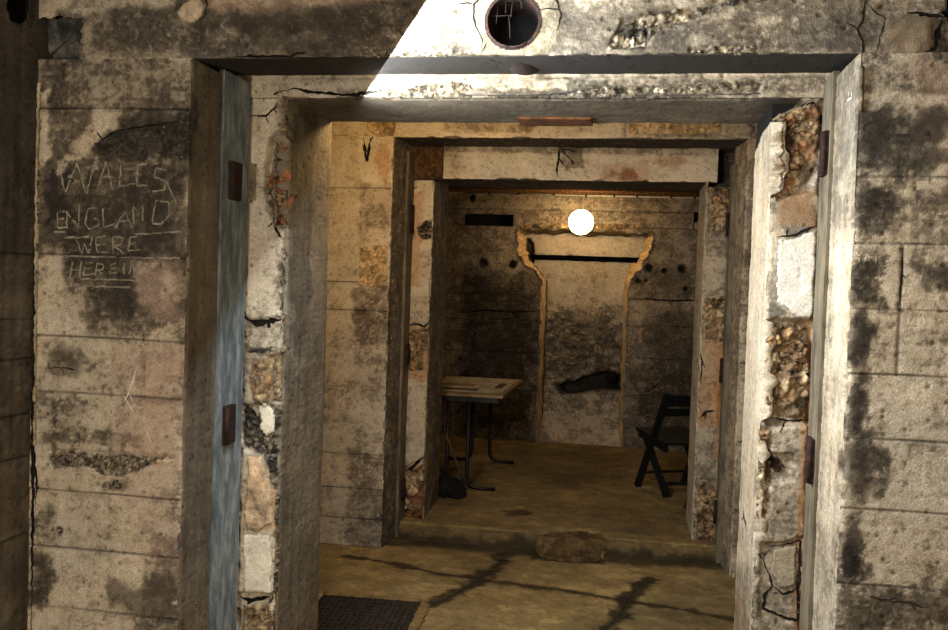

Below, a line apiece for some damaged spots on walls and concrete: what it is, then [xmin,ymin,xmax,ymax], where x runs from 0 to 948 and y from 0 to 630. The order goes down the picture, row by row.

crack [459,0,486,53]
crack [540,0,562,30]
spalling [606,0,749,50]
crack [846,0,945,53]
crack [252,88,394,124]
spalling [755,104,822,201]
spalling [516,221,654,447]
spalling [764,320,812,420]
crack [30,203,74,630]
spalling [48,449,176,491]
spalling [752,424,784,527]
crack [757,540,802,622]